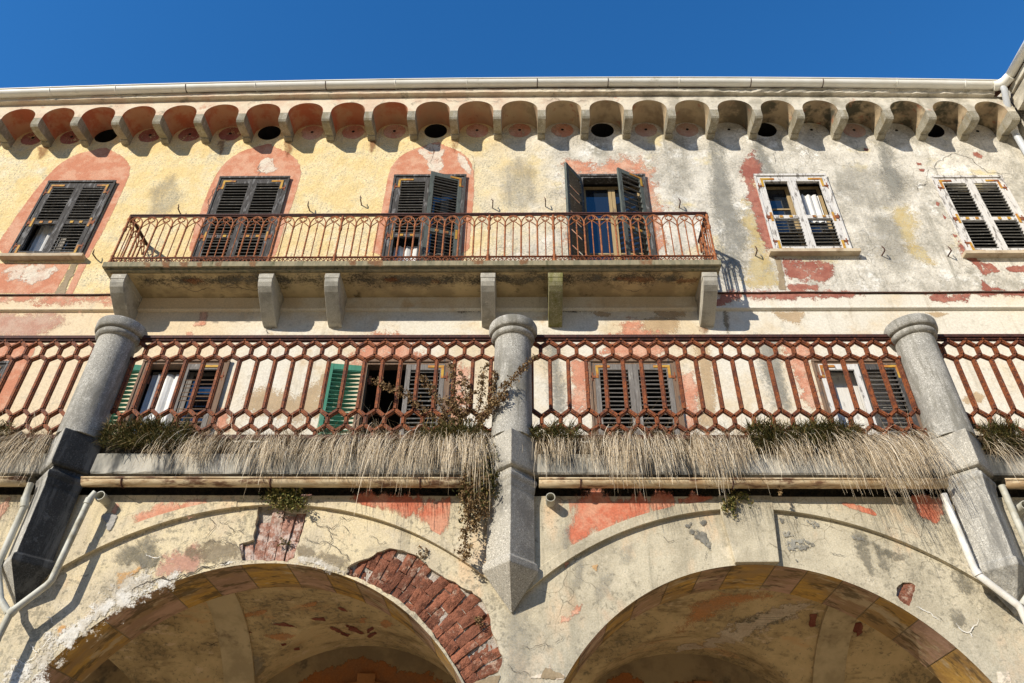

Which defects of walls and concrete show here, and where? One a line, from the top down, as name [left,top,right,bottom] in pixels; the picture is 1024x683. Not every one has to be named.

peeling [418,143,444,173]
peeling [1,263,78,294]
peeling [741,199,834,291]
peeling [924,234,1024,305]
spalling [239,506,307,567]
crack [301,518,349,560]
peeling [352,492,451,535]
peeling [568,489,713,544]
spalling [685,520,711,550]
water stain [3,533,179,683]
spalling [346,548,502,683]
spalling [896,582,916,606]